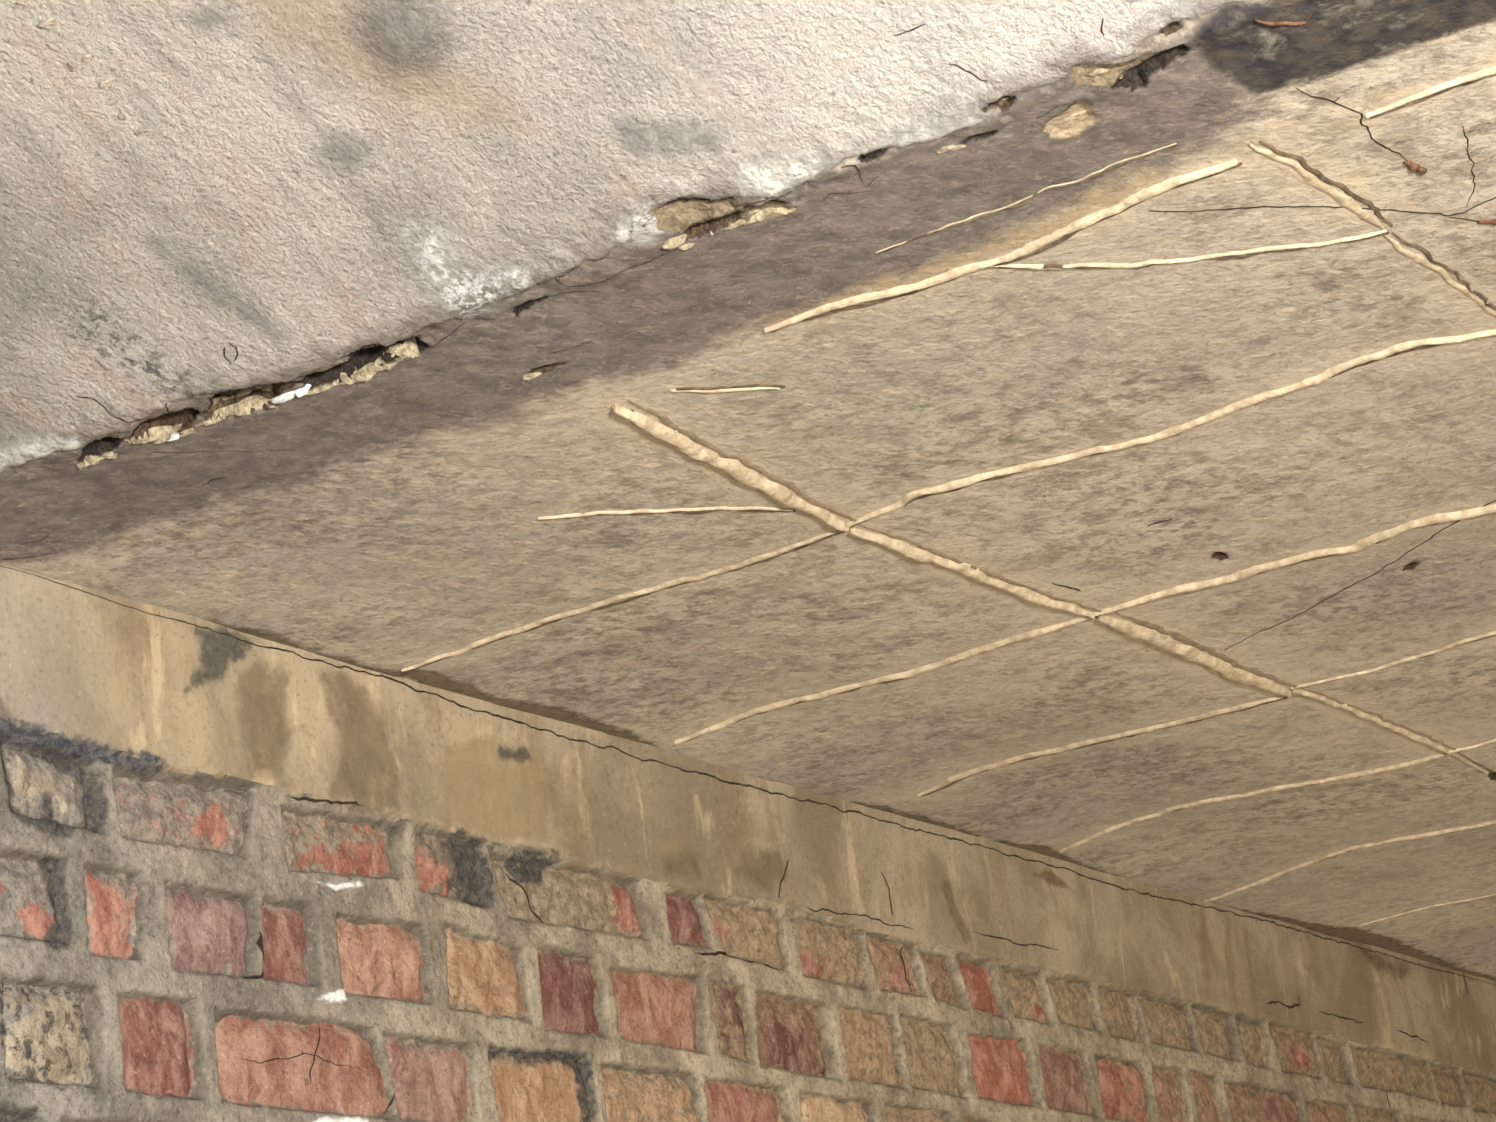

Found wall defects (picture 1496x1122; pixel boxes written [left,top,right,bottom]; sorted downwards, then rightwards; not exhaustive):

spalling [650,198,801,250]
leakage [0,0,1496,562]
spalling [857,145,891,163]
peeling [1043,22,1189,138]
crack [1152,123,1496,222]
crack [1295,87,1408,161]
spalling [77,336,428,469]
crack [1225,500,1496,650]
leakage [0,701,165,838]
leakage [186,622,655,807]
crack [0,534,1495,992]
leakage [325,881,362,890]